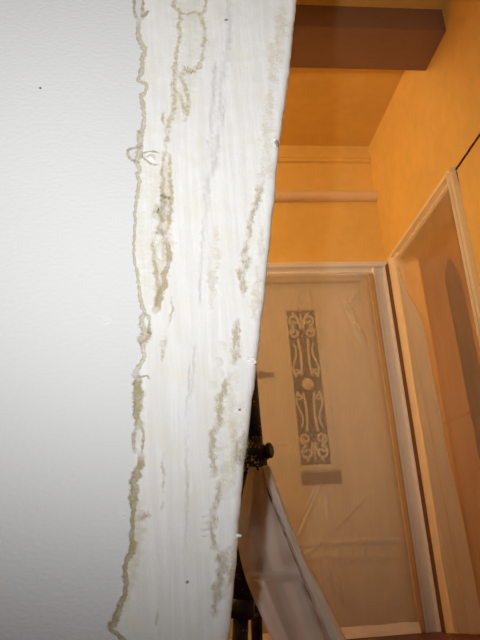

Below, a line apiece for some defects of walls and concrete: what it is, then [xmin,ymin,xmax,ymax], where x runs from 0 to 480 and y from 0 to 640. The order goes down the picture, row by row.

water stain [127,27,156,164]
water stain [153,253,168,307]
water stain [133,375,149,421]
water stain [108,461,144,639]